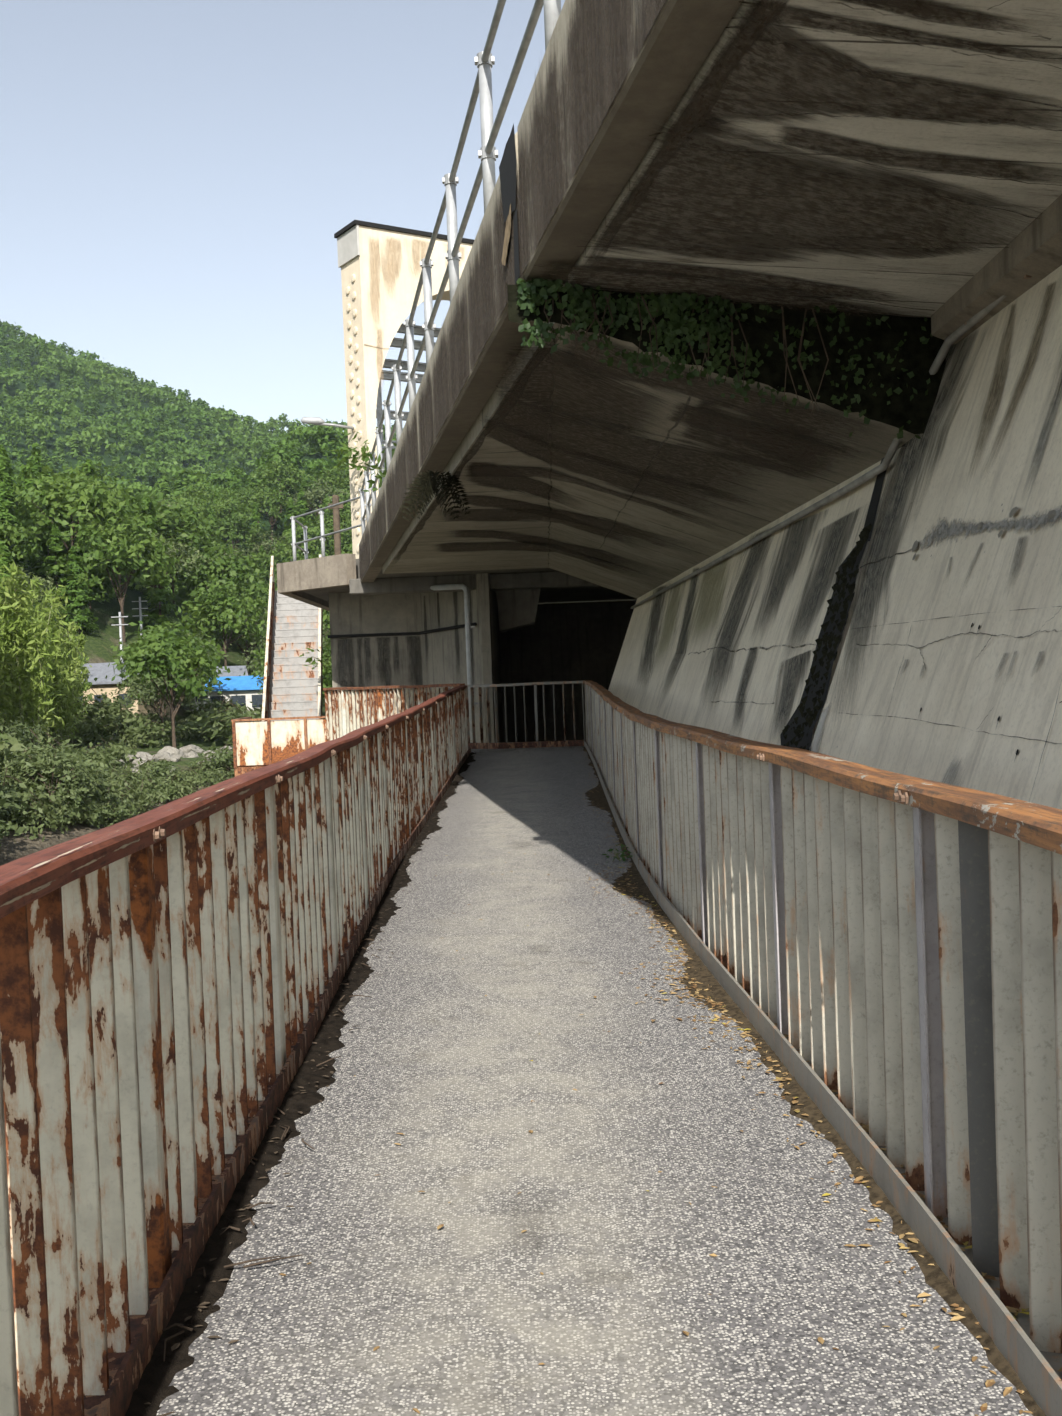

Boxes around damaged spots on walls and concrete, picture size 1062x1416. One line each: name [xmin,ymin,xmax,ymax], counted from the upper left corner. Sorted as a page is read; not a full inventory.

damp [359,0,1062,580]
damp [847,333,975,664]
damp [640,580,666,673]
damp [667,569,698,682]
damp [708,510,858,728]
damp [810,707,829,752]